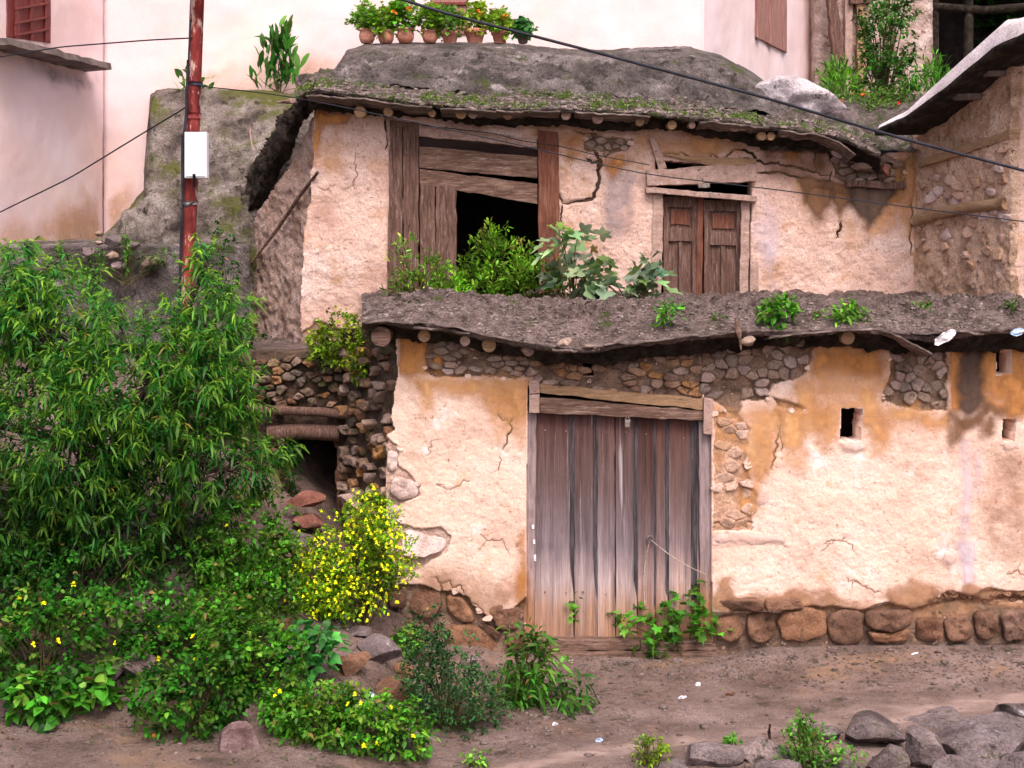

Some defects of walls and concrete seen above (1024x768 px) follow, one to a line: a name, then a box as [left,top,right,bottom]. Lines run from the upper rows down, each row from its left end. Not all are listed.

crack [559,150,603,222]
flaking render [578,132,634,158]
damp [765,150,917,229]
flaking render [827,152,908,183]
damp [776,346,1009,451]
flaking render [881,351,949,411]
crack [497,414,513,471]
flaking render [422,341,814,533]
flaking render [384,438,526,655]
crack [820,537,854,552]